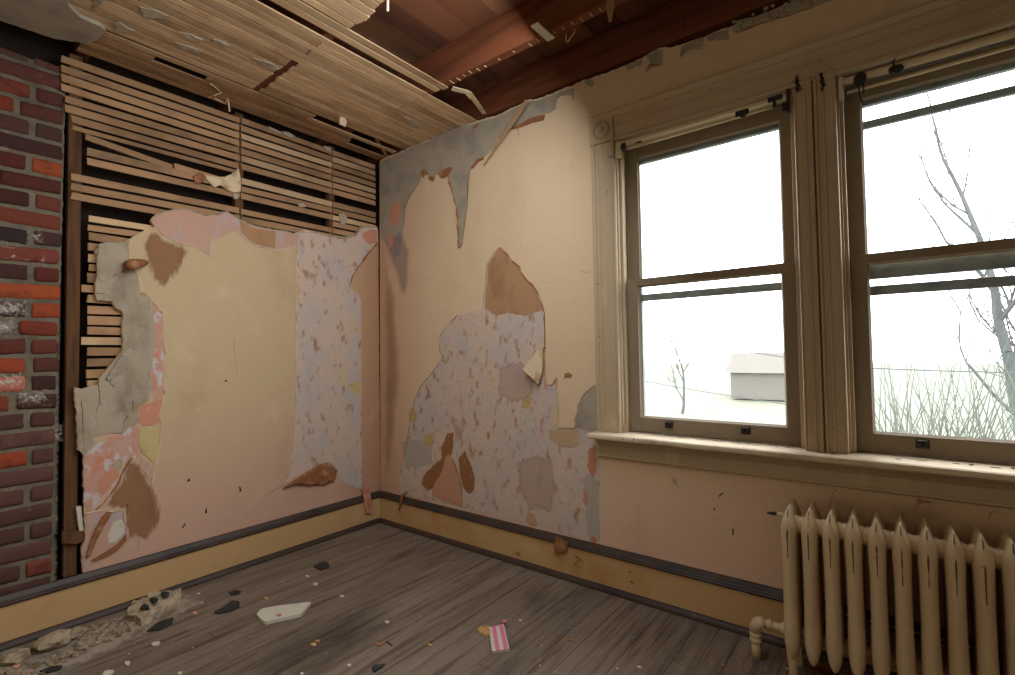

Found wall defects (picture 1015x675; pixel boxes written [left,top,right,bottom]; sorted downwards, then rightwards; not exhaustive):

flaking render [680,0,832,57]
spalling [0,21,574,580]
flaking render [576,387,597,431]